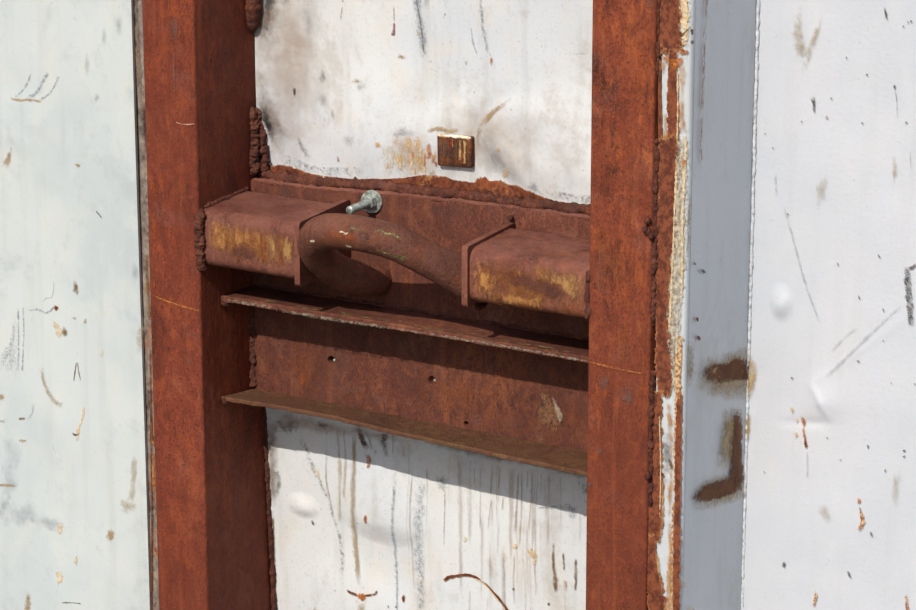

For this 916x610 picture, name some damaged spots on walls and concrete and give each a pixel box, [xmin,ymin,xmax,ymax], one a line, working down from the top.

rust [134,25,143,111]
rust [268,164,347,181]
rust [358,138,567,204]
peeling [647,0,690,610]
rust [704,351,755,393]
rust [149,350,158,610]
rust [656,392,693,610]
rust [694,411,750,504]